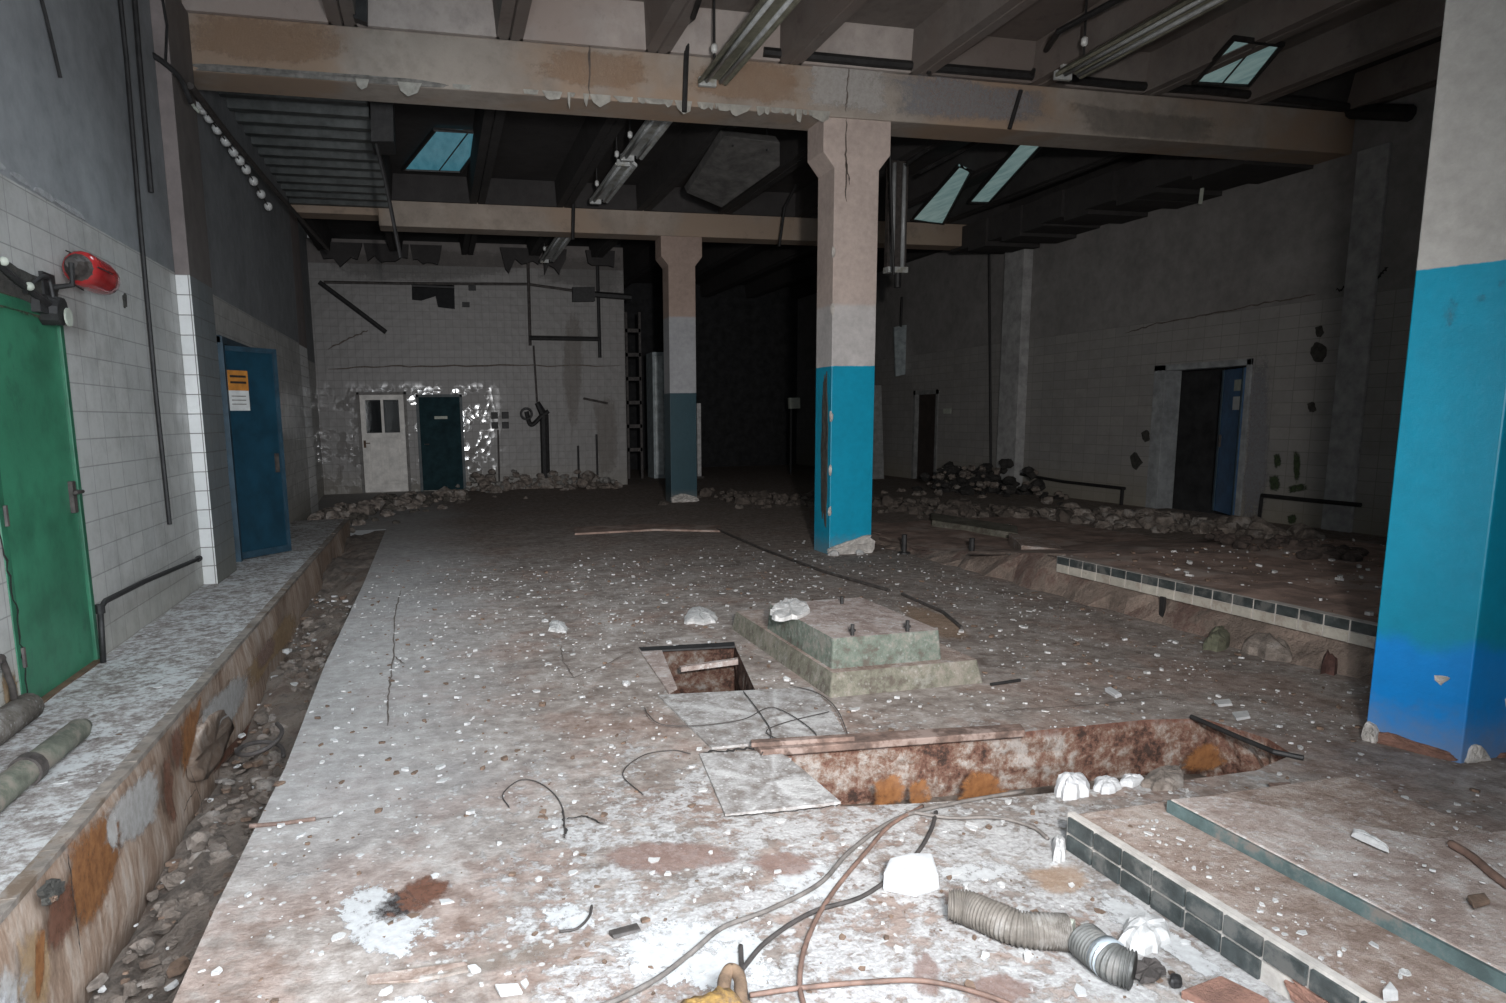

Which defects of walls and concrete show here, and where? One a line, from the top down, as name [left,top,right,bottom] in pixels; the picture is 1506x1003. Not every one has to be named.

spalling [1310,326,1327,362]
crack [387,591,405,726]
peeling [1434,675,1450,685]
spalling [1361,721,1506,764]
rust [874,774,931,805]
rust [959,771,1007,800]
rust [18,814,121,1003]